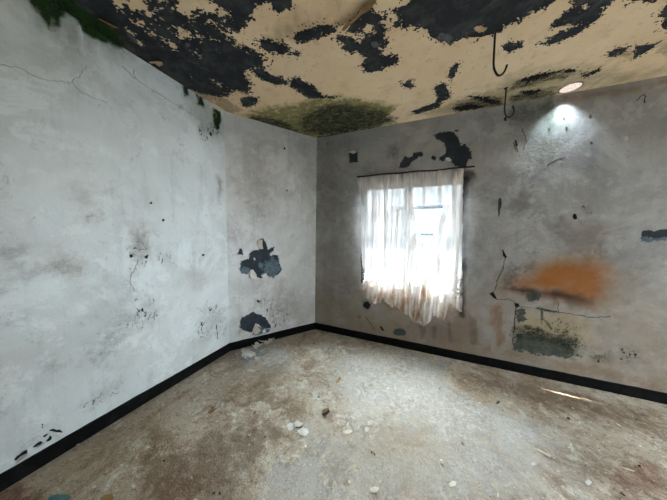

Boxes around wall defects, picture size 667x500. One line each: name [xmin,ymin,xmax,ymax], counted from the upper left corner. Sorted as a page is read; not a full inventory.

peeling [74,0,556,114]
water stain [183,27,667,141]
peeling [535,0,657,46]
peeling [603,1,667,62]
peeling [431,130,472,169]
peeling [238,238,282,279]
peeling [640,229,667,244]
peeling [239,299,285,339]
crack [489,250,610,346]
corrosion [482,240,642,355]
water stain [472,301,667,393]
peeling [14,424,64,463]